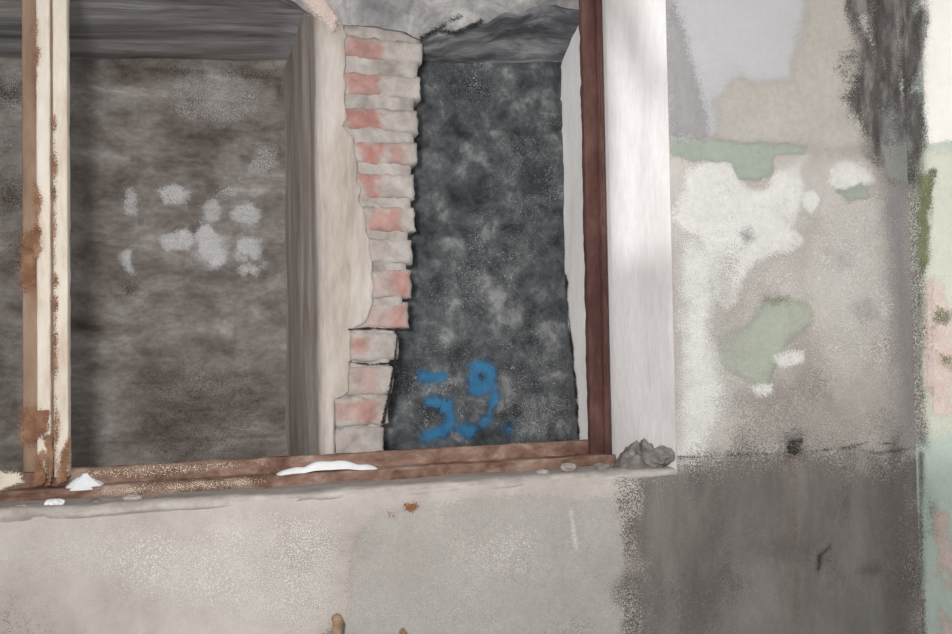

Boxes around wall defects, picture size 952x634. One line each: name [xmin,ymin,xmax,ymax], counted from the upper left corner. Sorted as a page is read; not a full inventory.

corrosion [30,12,42,108]
corrosion [10,113,72,487]
leakage [605,0,934,634]
flaking render [669,137,952,483]
spalling [774,424,815,624]